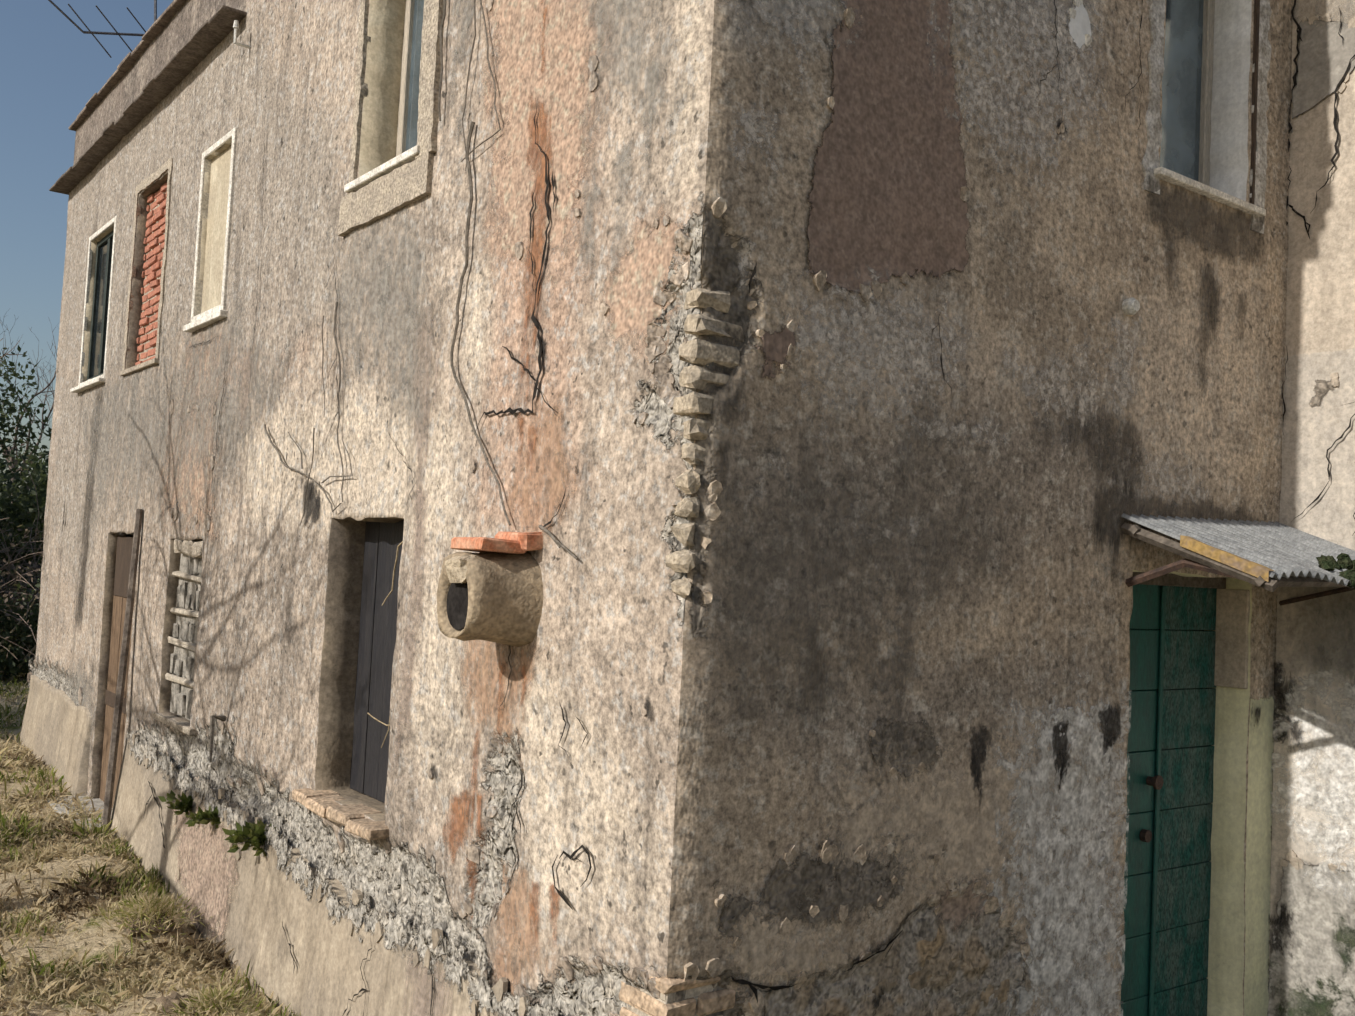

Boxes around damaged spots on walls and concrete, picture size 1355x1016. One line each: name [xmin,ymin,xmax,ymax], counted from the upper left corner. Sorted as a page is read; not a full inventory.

flaking render [807,0,971,303]
crack [1286,0,1355,239]
leakage [1149,180,1264,387]
flaking render [599,192,798,641]
crack [1280,346,1288,435]
crack [1291,402,1355,522]
leakage [1052,720,1070,789]
leakage [1099,702,1121,761]
peeling [126,681,1130,1016]
crack [731,976,796,1003]
crack [845,917,911,987]